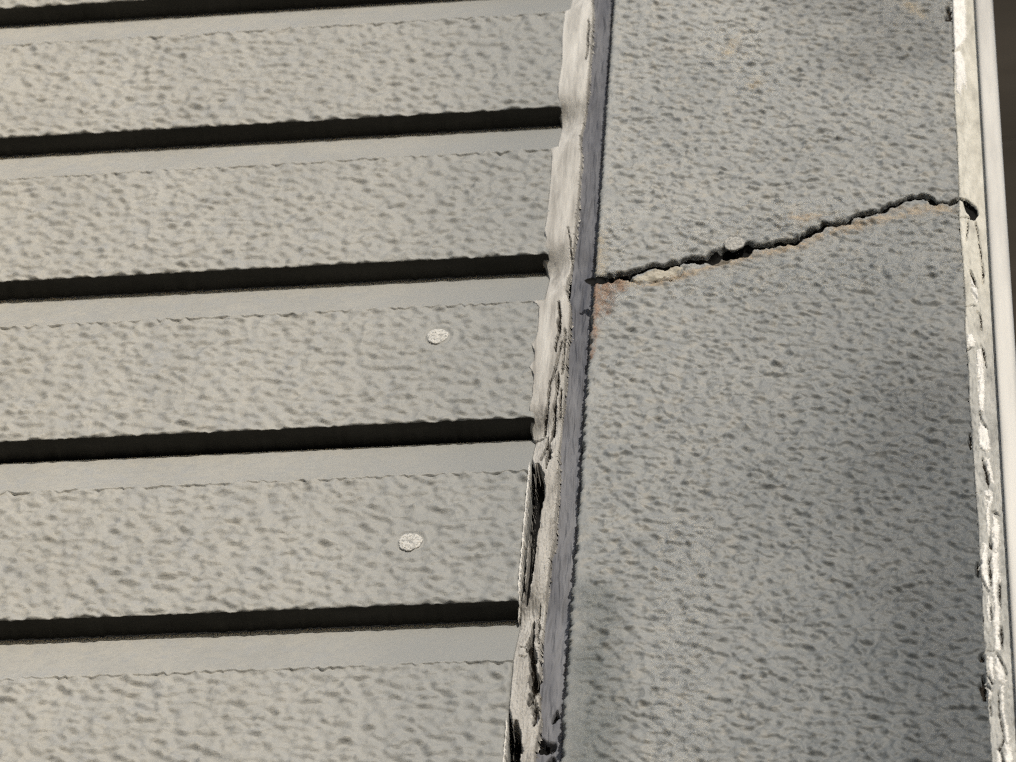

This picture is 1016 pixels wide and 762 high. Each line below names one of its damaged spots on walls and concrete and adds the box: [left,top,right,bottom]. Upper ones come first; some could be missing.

crack [570,198,987,369]
crack [536,308,566,465]
crack [528,613,541,727]